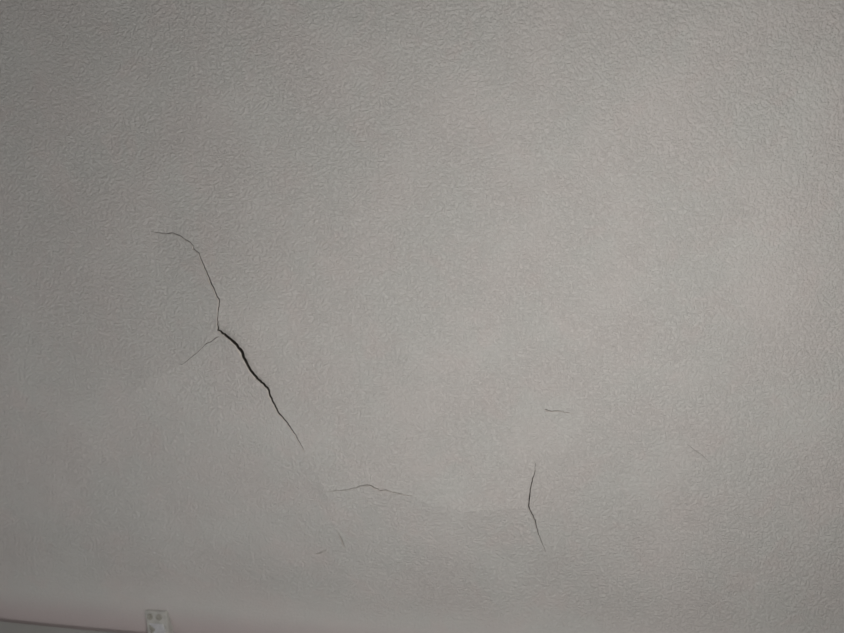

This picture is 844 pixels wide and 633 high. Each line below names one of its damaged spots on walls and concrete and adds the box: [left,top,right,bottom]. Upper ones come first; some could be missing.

crack [151,231,305,453]
crack [327,485,411,496]
crack [527,465,546,552]